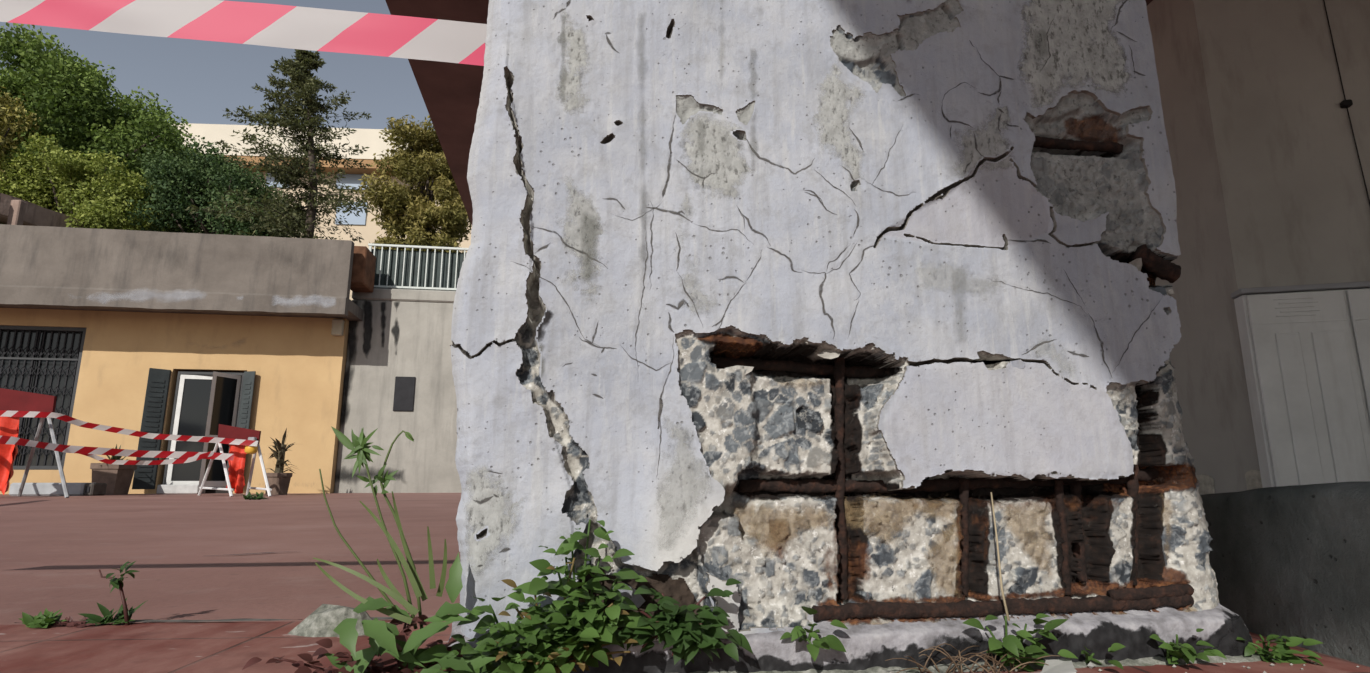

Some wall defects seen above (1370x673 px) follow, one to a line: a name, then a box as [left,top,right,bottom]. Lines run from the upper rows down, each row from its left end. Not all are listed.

spalling [830,0,962,96]
spalling [960,0,1178,271]
corrosion [1064,116,1120,158]
crack [1110,0,1146,76]
crack [452,19,1160,525]
corrosion [1107,251,1172,287]
spalling [574,326,1134,630]
corrosion [698,334,1198,625]
spalling [1106,355,1219,612]